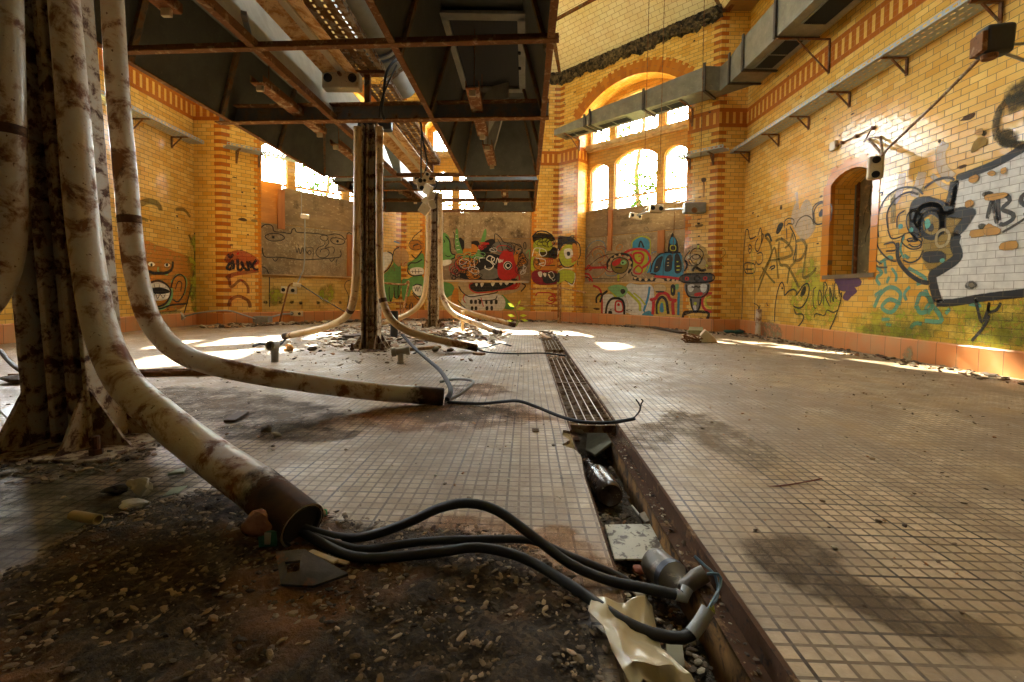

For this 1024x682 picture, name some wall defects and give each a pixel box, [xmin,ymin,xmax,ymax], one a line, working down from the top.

peeling [958,164,1008,208]
peeling [969,223,1018,250]